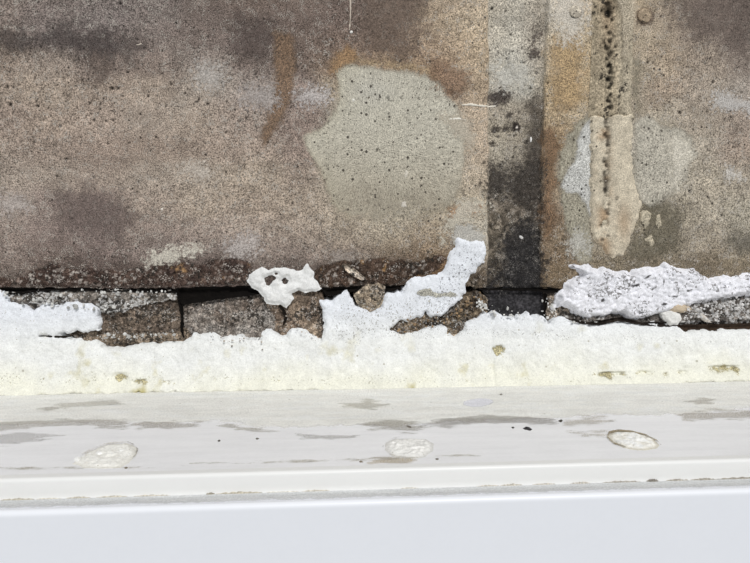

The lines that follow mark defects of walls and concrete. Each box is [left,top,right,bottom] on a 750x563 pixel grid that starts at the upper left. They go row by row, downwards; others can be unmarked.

corrosion [261,31,295,141]
damp [482,0,592,147]
damp [237,65,553,298]
spalling [0,258,252,288]
spalling [95,255,446,338]
spalling [470,268,487,288]